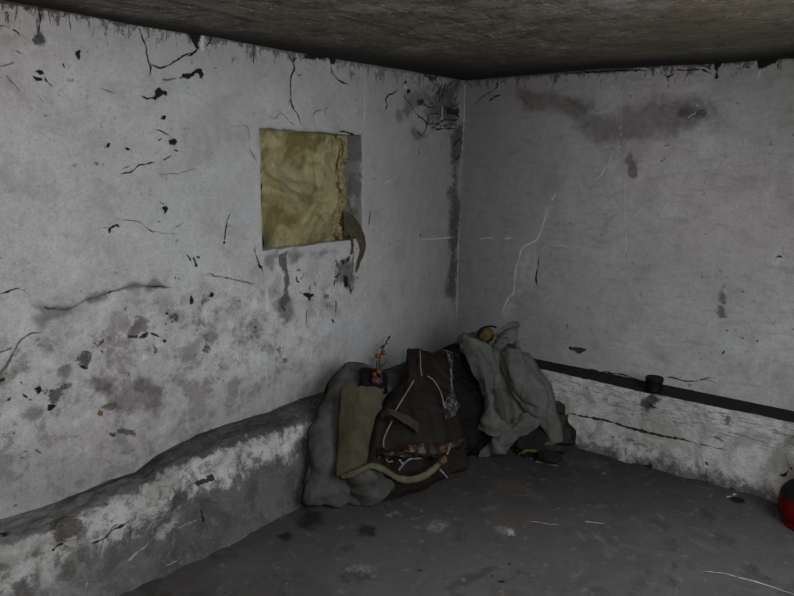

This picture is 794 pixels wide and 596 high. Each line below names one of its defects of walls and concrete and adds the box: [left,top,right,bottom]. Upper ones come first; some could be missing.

spalling [141,68,204,100]
crack [140,31,212,74]
spalling [186,33,204,56]
crack [271,53,328,125]
crack [329,58,347,84]
water stain [404,74,460,136]
crack [122,162,186,180]
water stain [279,252,341,323]
water stain [334,249,354,292]
crack [0,332,38,375]
crack [569,413,724,450]